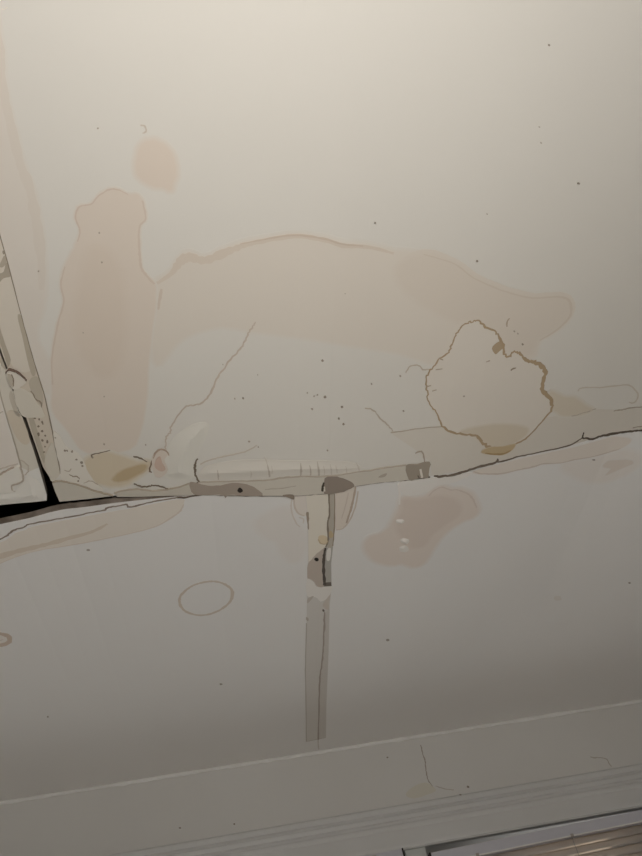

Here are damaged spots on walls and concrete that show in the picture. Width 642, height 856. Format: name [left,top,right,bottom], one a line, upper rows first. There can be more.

peeling [0,251,10,281]
water stain [0,11,642,485]
peeling [0,314,103,491]
crack [0,322,320,540]
crack [354,426,642,487]
water stain [0,499,185,564]
water stain [360,484,483,569]